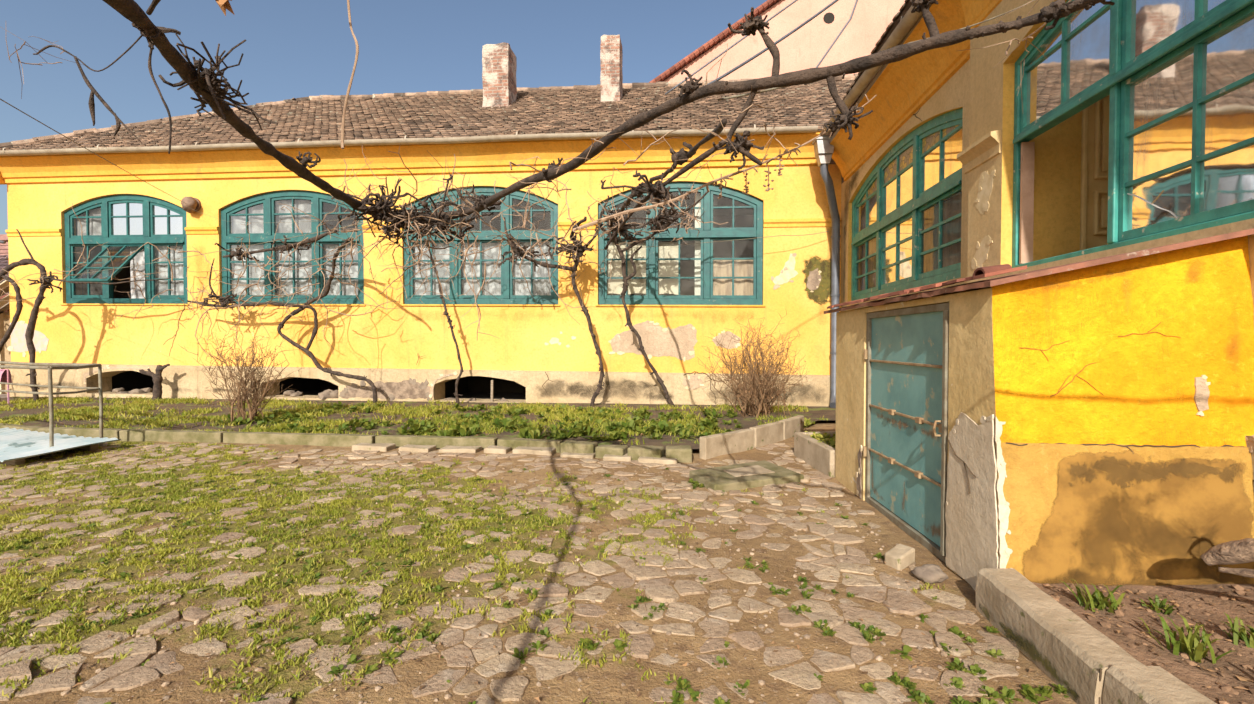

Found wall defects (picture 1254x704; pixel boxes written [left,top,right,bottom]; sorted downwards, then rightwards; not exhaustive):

peeling [771,253,822,292]
flaking render [608,320,704,390]
flaking render [712,331,741,349]
crack [1020,340,1103,397]
crack [1118,322,1181,338]
flaking render [1194,375,1211,416]
peeling [945,412,1013,591]
damp [1023,450,1254,586]